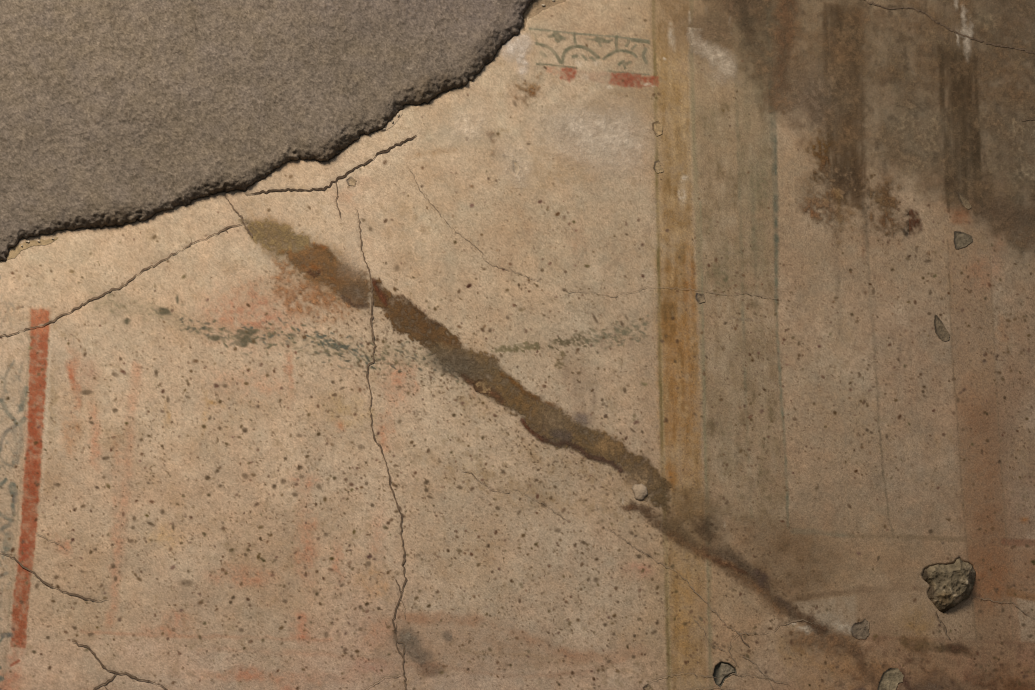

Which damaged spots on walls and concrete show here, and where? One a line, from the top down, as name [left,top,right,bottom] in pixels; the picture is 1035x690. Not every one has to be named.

flaking render [522,0,565,30]
crack [865,0,1035,54]
flaking render [379,110,403,132]
leakage [689,0,1035,252]
flaking render [6,237,58,260]
crack [0,135,815,690]
leakage [240,218,864,669]